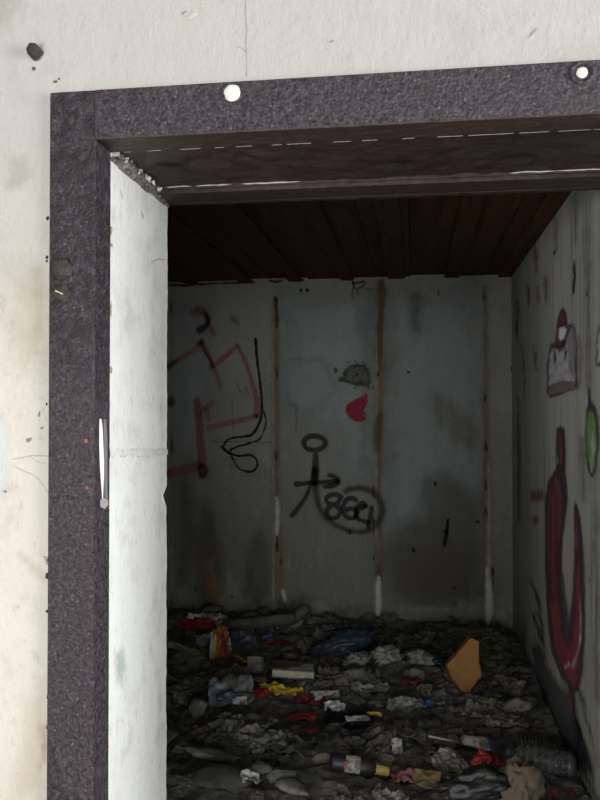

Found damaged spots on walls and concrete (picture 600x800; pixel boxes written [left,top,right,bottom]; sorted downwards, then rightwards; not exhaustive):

spalling [111,152,230,208]